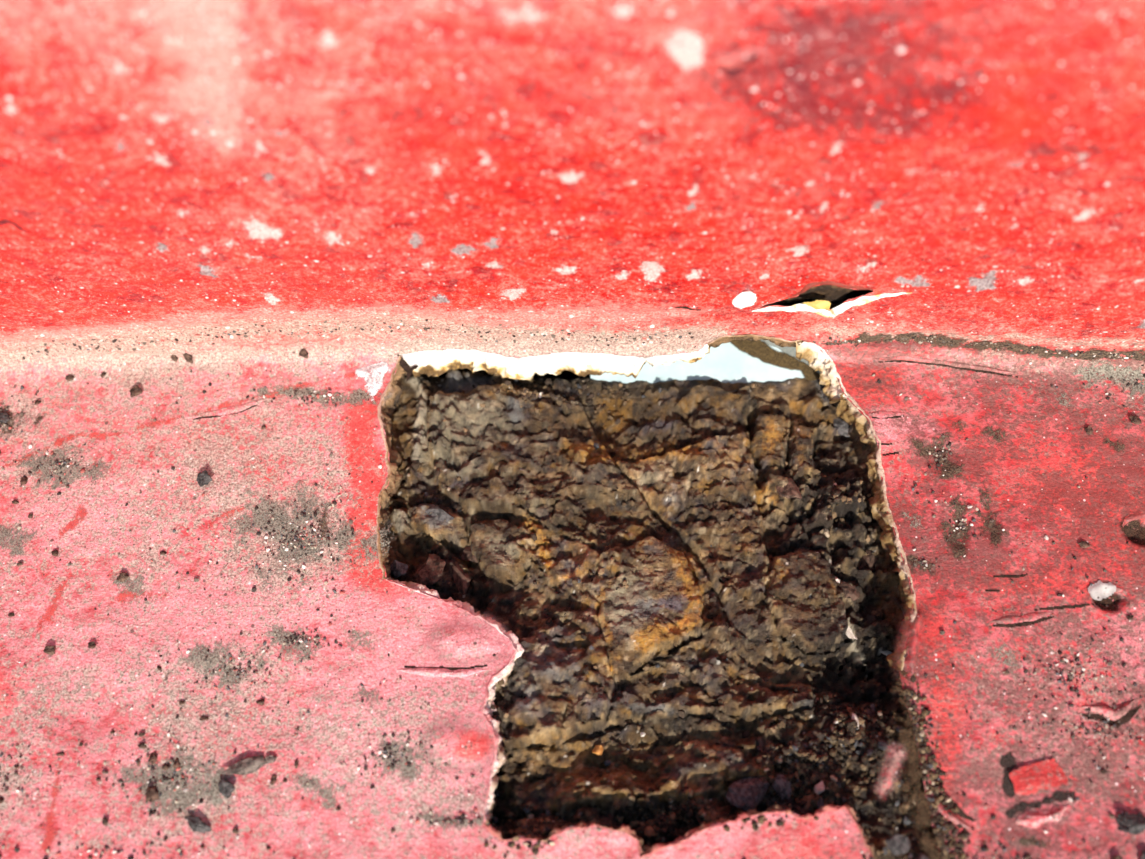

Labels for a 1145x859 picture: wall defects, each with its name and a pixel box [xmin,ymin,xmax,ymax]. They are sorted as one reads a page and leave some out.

spalling [355,334,918,858]